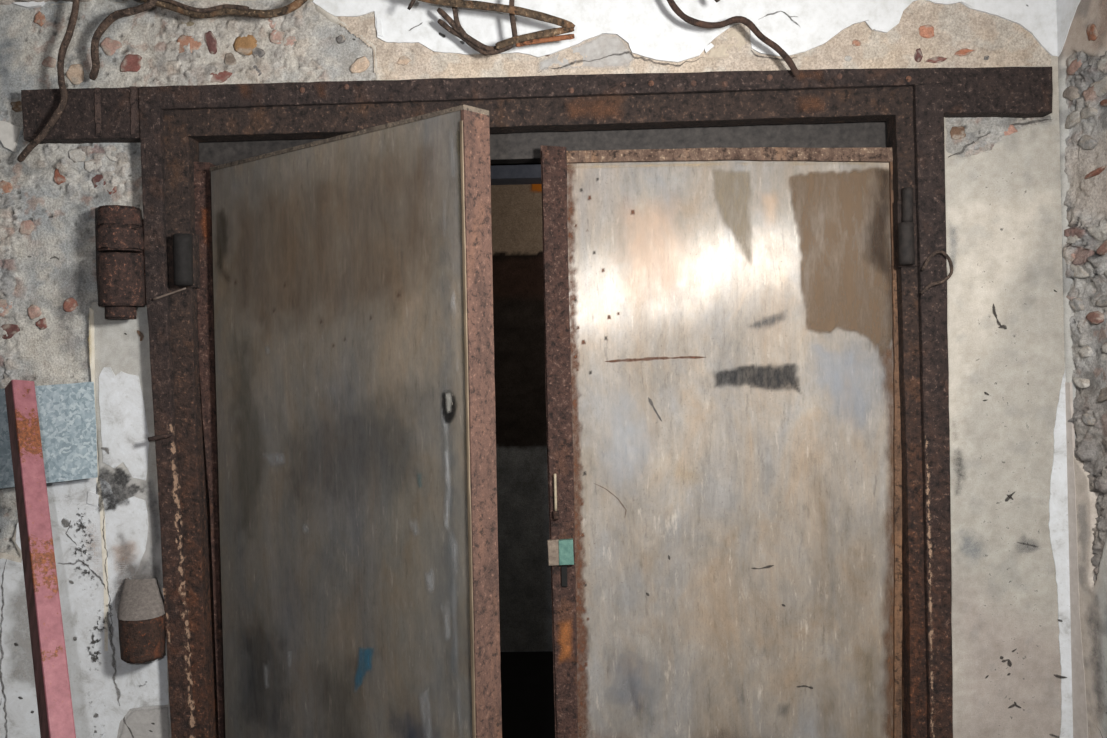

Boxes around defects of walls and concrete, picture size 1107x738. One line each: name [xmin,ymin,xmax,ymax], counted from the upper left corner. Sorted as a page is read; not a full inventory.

peeling [64,0,1081,89]
spalling [945,115,1052,157]
spalling [1086,0,1107,41]
crack [0,562,8,738]
spalling [0,1,169,738]
corrosion [560,164,592,738]
corrosion [883,348,894,738]
spalling [1048,51,1107,738]